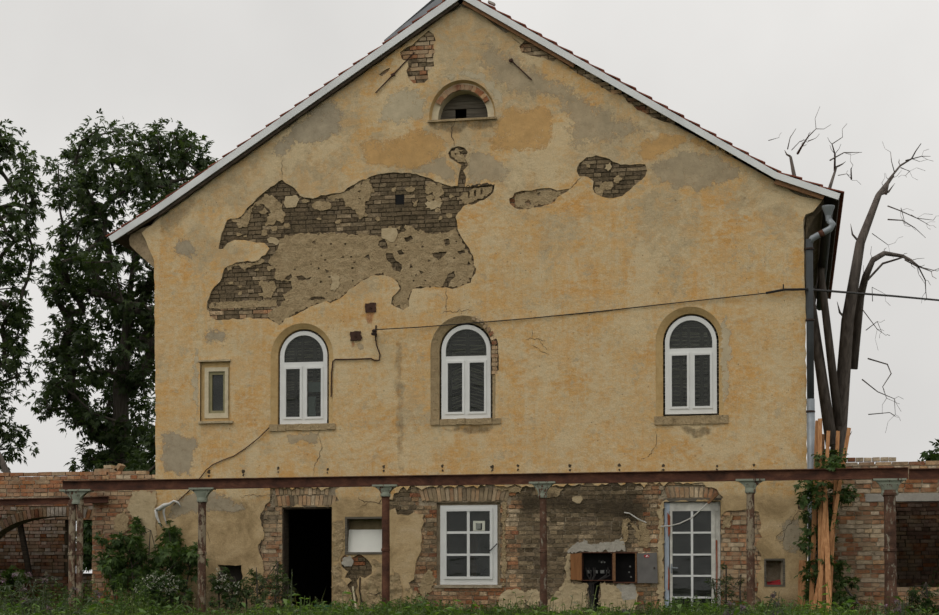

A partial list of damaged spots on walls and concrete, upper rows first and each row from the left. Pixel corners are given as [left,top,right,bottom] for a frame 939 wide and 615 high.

flaking render [401,31,436,83]
peeling [272,101,344,156]
peeling [480,41,732,209]
flaking render [205,147,495,342]
flaking render [258,487,340,615]
flaking render [331,482,762,615]